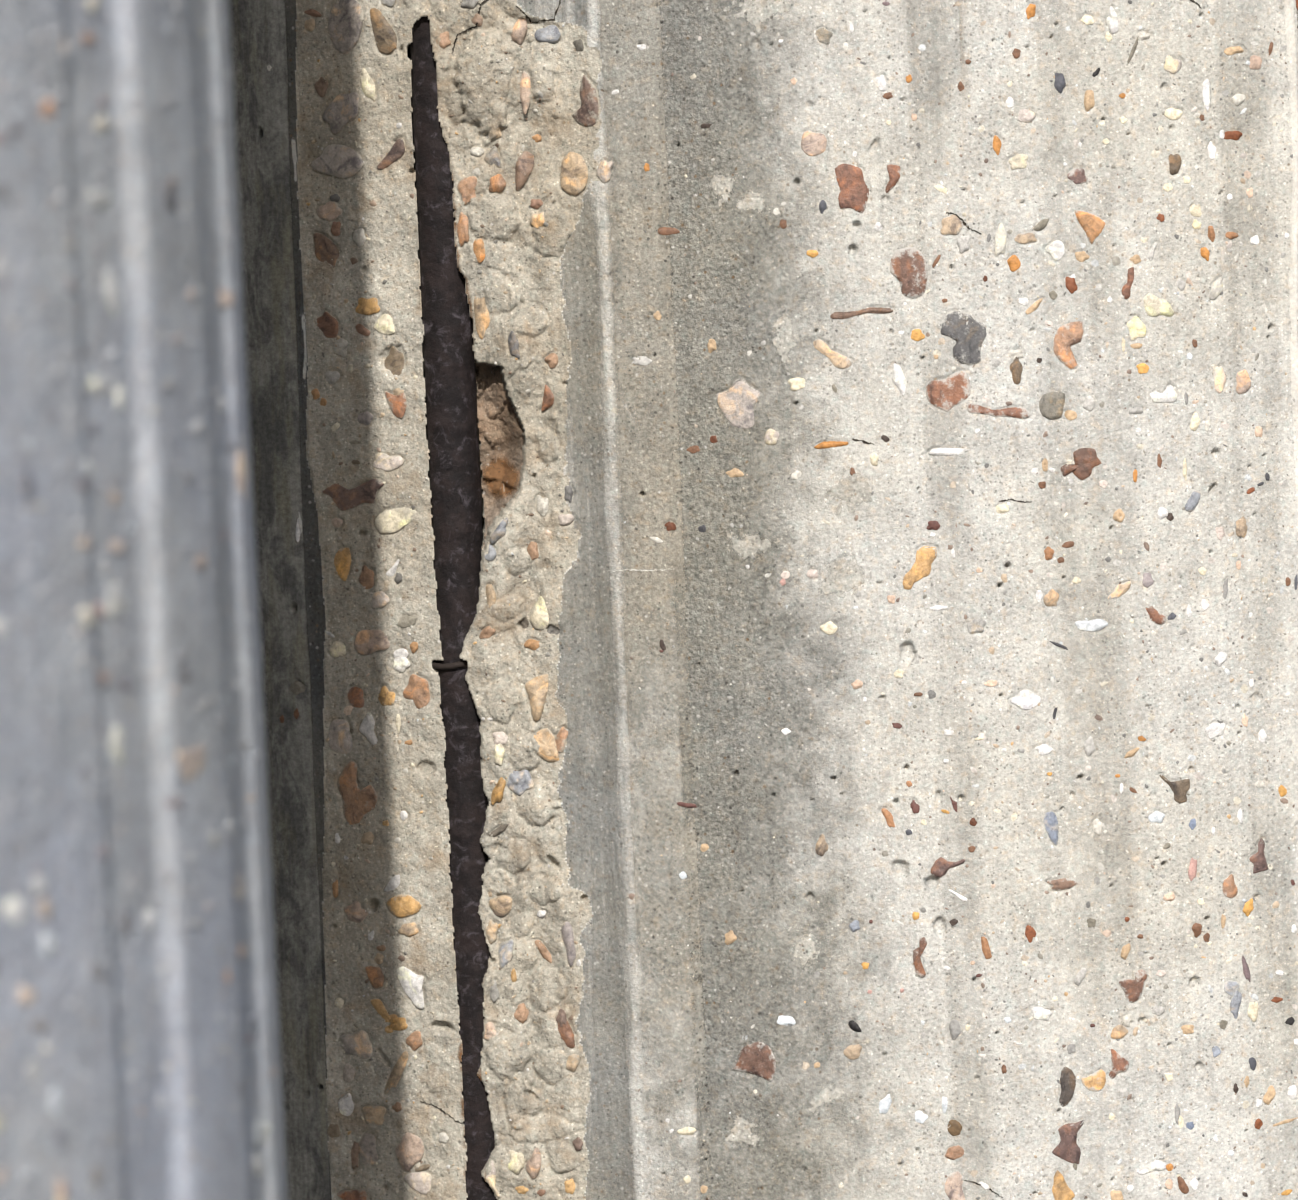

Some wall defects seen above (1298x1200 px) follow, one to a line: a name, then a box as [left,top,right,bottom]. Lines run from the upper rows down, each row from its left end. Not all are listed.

spalling [291,0,613,1200]
crack [452,0,561,51]